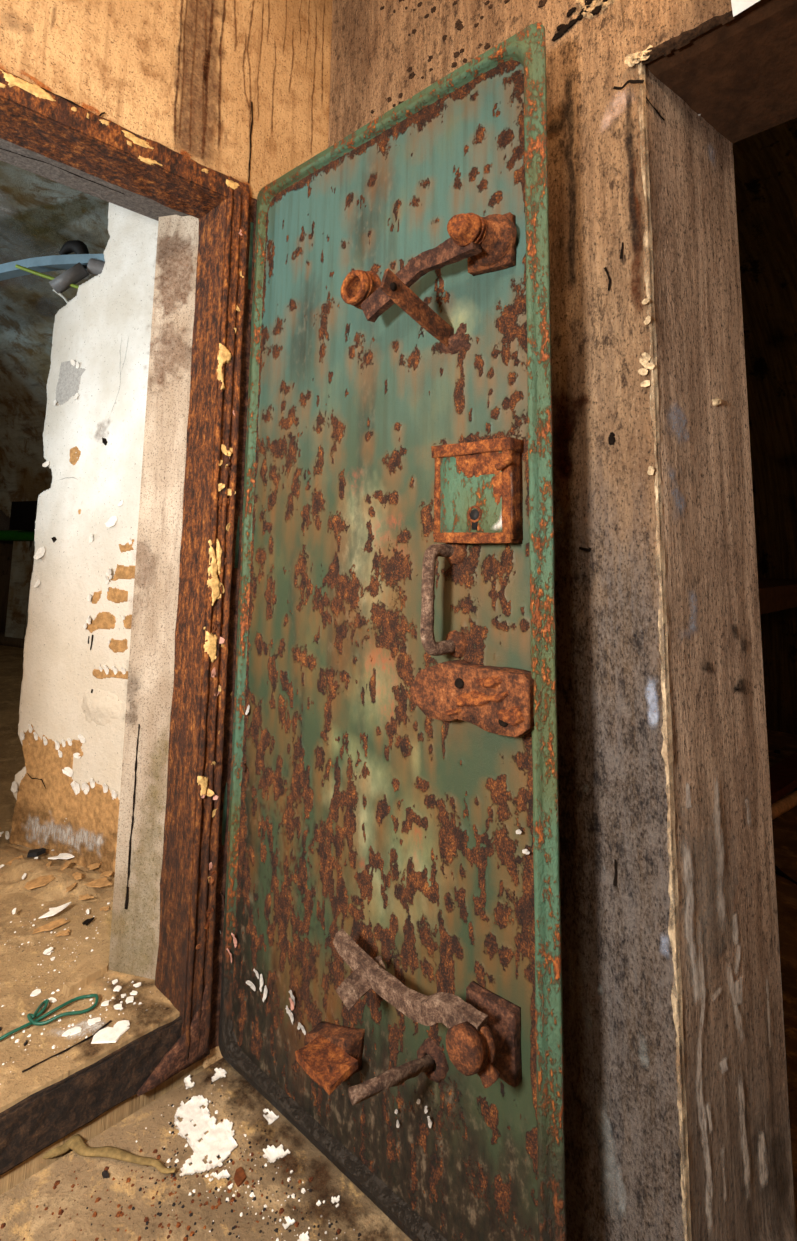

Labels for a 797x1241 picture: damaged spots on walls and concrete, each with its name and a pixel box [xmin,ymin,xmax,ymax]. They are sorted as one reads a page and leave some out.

spalling [380,0,436,36]
spalling [442,0,510,68]
spalling [552,0,615,42]
water stain [174,0,325,158]
rust [454,452,502,505]
peeling [83,538,135,679]
peeling [5,724,120,877]
rust [110,982,172,1025]
rust [58,1022,101,1056]
rust [224,1079,390,1241]